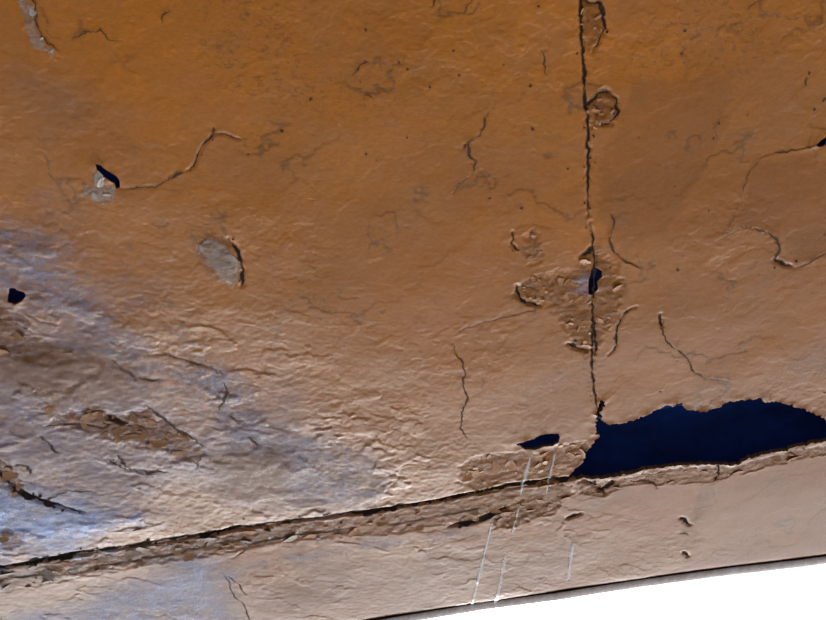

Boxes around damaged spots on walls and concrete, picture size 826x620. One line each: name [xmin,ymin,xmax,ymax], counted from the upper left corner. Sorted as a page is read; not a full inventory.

peeling [18,0,55,57]
peeling [585,90,617,129]
crack [569,0,639,413]
peeling [197,241,239,286]
peeling [0,288,74,367]
crack [451,286,545,439]
peeling [515,251,626,356]
crack [0,465,93,514]
crack [39,407,203,468]
crack [108,451,169,478]
crack [0,476,658,581]
spalling [461,398,826,525]